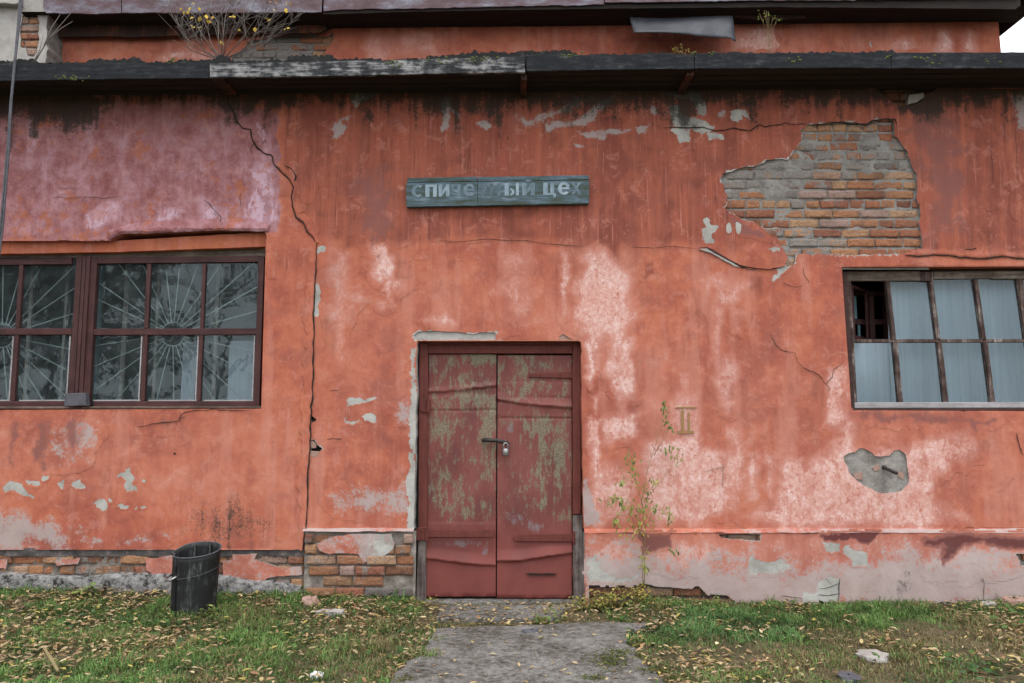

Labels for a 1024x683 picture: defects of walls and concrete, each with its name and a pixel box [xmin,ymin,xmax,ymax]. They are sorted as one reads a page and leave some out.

peeling [511,91,752,150]
crack [665,118,898,131]
spalling [699,120,929,284]
crack [906,247,1024,259]
crack [228,97,338,551]
leakage [0,89,1024,595]
crack [769,332,843,389]
crack [140,409,246,427]
peeling [0,409,176,575]
spalling [219,331,496,602]
spalling [844,448,908,493]
peeling [800,575,842,604]